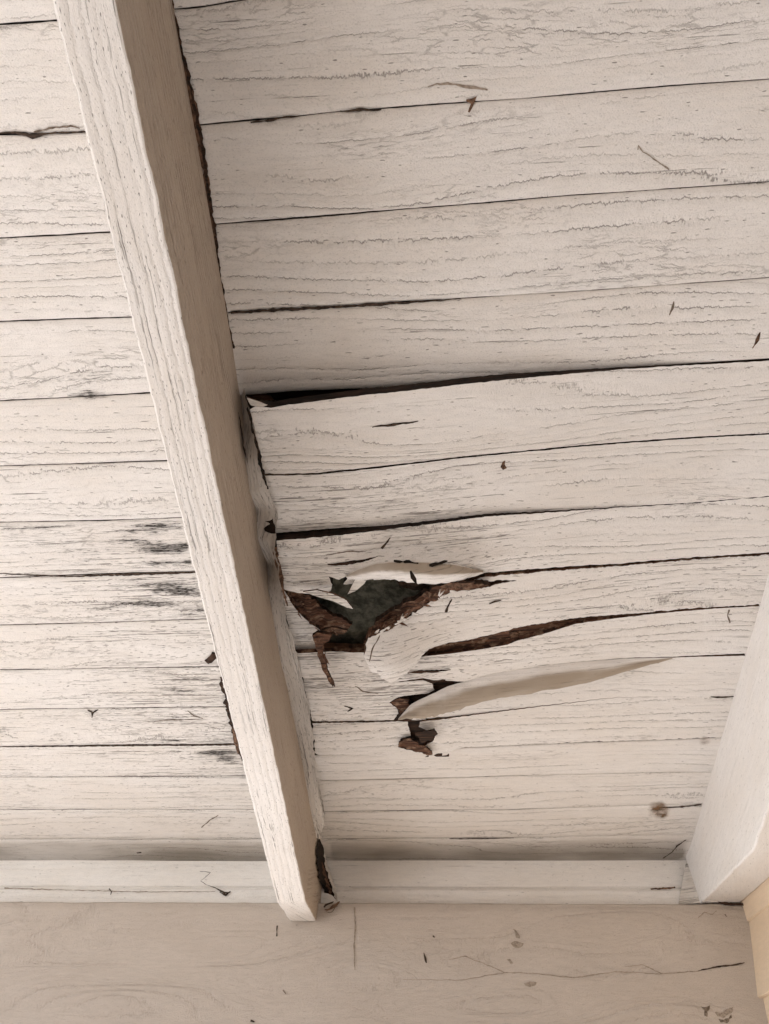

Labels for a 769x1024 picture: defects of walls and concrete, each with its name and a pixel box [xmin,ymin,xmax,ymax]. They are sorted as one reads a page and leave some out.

peeling [303,580,366,609]
spalling [374,574,489,625]
peeling [398,728,438,755]
crack [404,935,745,981]